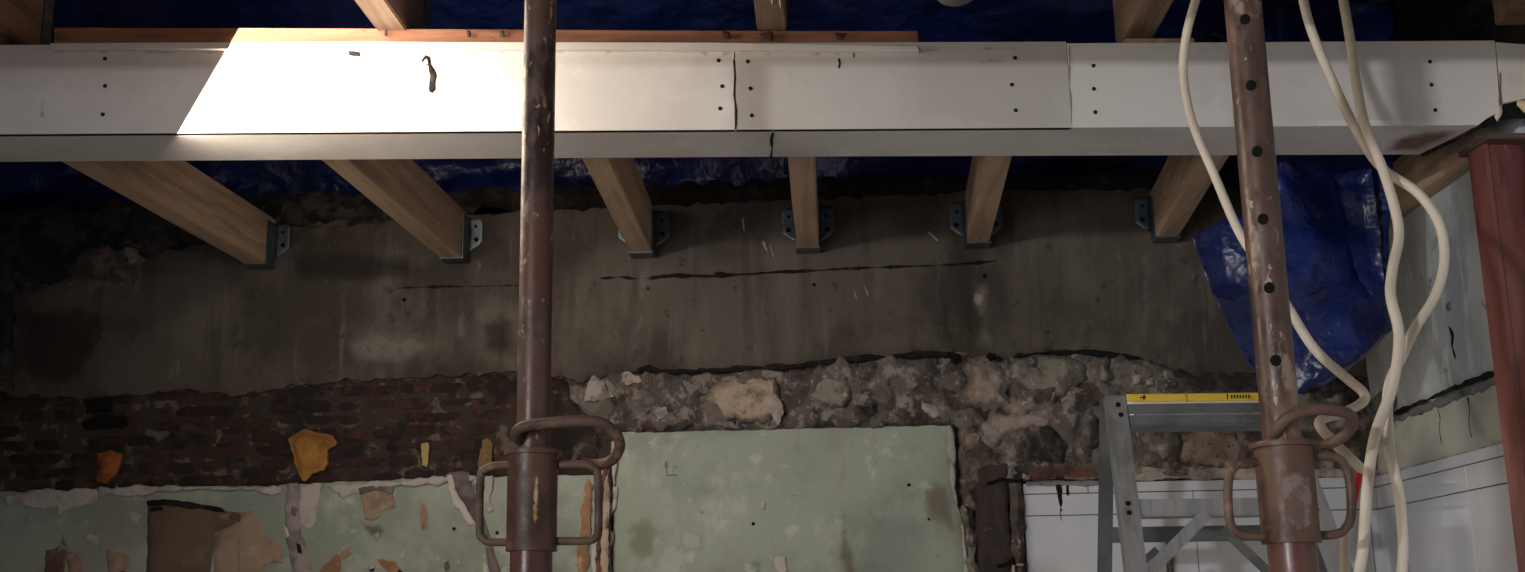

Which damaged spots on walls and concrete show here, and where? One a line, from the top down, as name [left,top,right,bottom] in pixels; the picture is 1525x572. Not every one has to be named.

spalling [240,189,390,227]
spalling [448,185,521,214]
crack [395,283,519,291]
crack [601,261,997,280]
flaking render [0,197,517,572]
flaking render [1298,377,1378,478]
flaking render [550,352,1262,572]